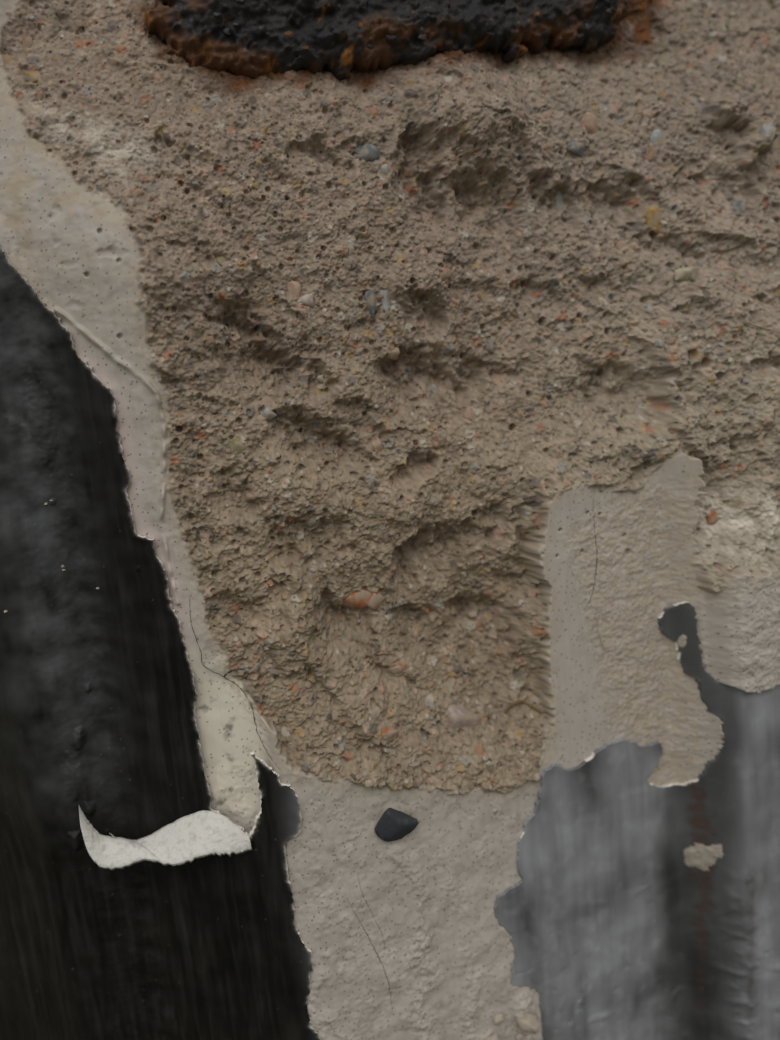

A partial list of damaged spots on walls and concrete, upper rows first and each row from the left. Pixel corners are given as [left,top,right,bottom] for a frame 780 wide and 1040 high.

rust [530,0,660,59]
spalling [0,0,780,795]
peeling [190,663,278,834]
peeling [272,729,543,1040]
peeling [683,842,724,871]